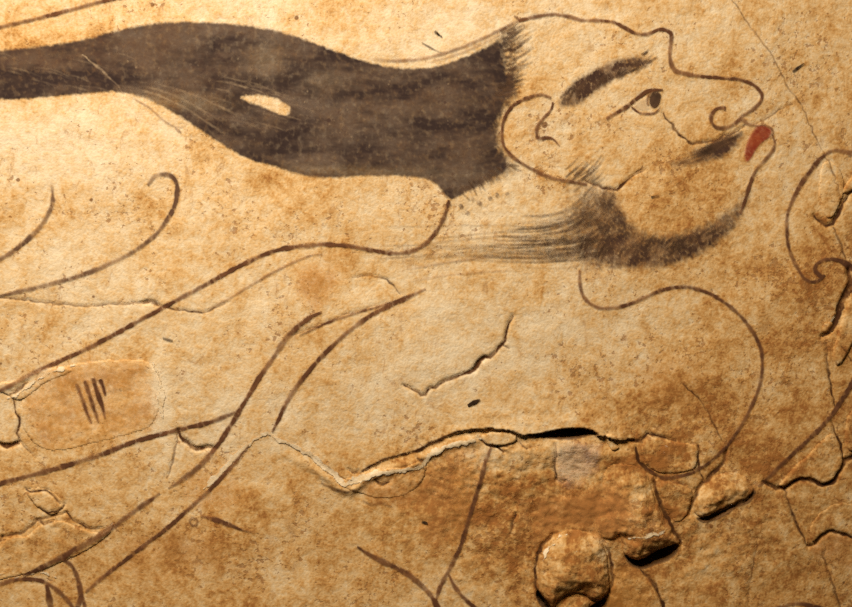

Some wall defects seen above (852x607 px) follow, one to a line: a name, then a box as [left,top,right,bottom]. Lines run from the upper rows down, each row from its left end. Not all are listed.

crack [813,191,852,227]
crack [822,251,852,337]
crack [404,317,513,396]
crack [826,358,835,406]
crack [177,427,527,493]
crack [589,430,726,543]
crack [764,427,852,546]
crack [534,536,552,592]
crack [605,546,614,593]
crack [640,569,665,607]